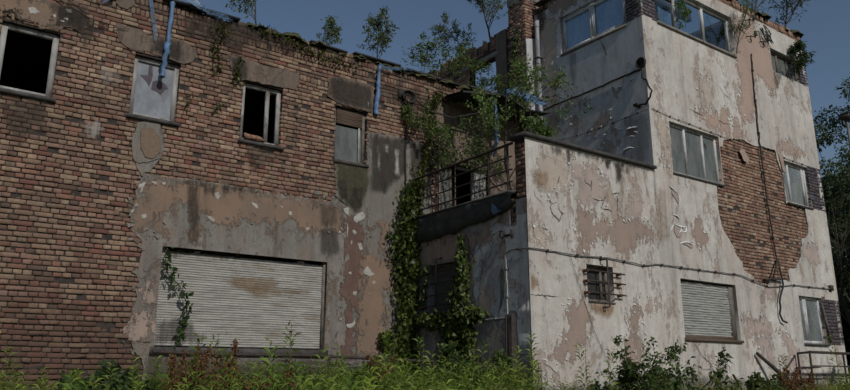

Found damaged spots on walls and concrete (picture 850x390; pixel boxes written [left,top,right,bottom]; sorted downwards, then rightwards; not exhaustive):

peeling [539,0,638,155]
water stain [189,183,242,235]
peeling [122,176,397,363]
water stain [338,134,434,211]
peeling [416,223,528,310]
peeling [528,147,654,265]
peeling [654,107,681,205]
peeling [670,214,710,251]
flaking render [695,14,821,285]
peeling [522,294,595,386]
peeling [620,293,662,376]